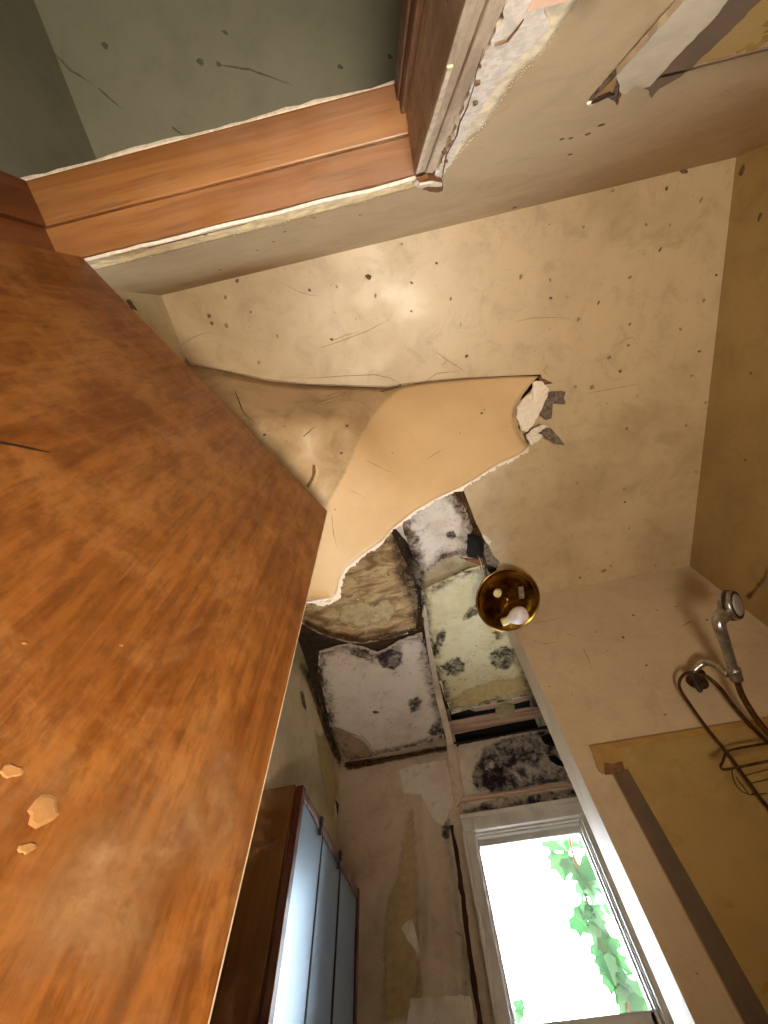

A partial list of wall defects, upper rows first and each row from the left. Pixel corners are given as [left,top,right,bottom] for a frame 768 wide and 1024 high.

spalling [587,69,621,107]
spalling [84,0,550,262]
water stain [453,491,481,536]
water stain [301,532,447,770]
mould [433,632,464,675]
mould [491,632,514,669]
peeling [399,729,570,826]
mould [466,730,577,812]